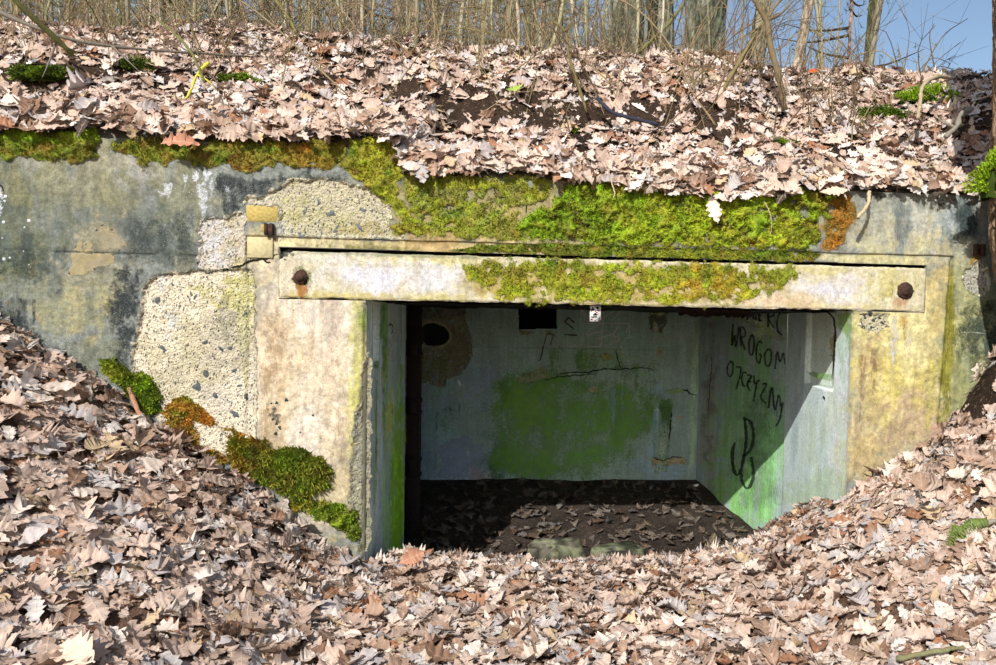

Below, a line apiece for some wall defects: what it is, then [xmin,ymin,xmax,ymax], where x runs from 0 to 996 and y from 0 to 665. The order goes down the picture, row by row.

spalling [129,177,408,460]
flaking render [407,301,473,389]
crack [544,352,653,380]